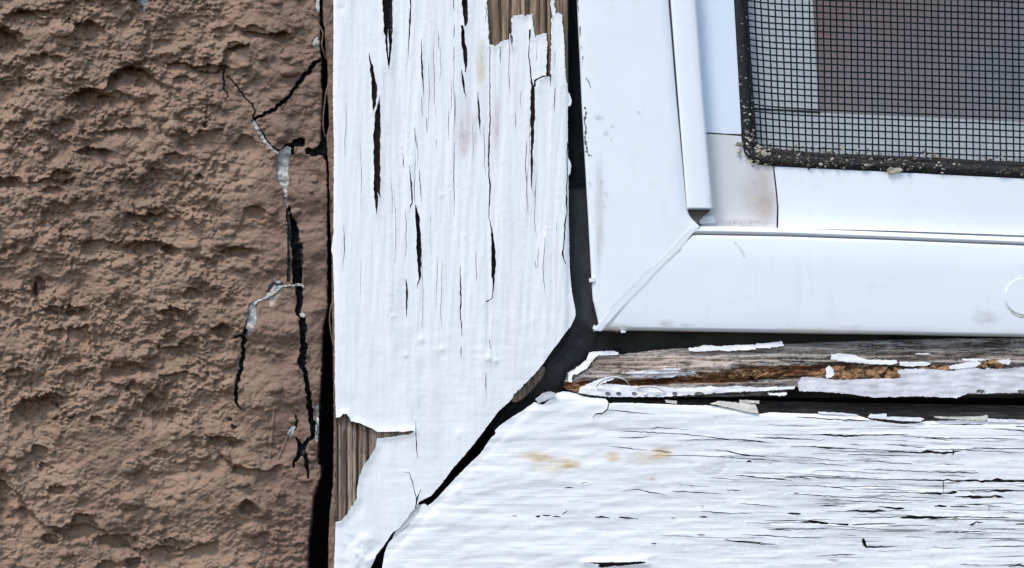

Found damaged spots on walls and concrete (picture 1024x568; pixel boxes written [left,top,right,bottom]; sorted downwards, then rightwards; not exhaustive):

peeling [486,0,568,84]
crack [223,0,592,479]
peeling [688,341,784,352]
peeling [567,351,1024,413]
peeling [336,414,414,522]
crack [593,403,1024,567]